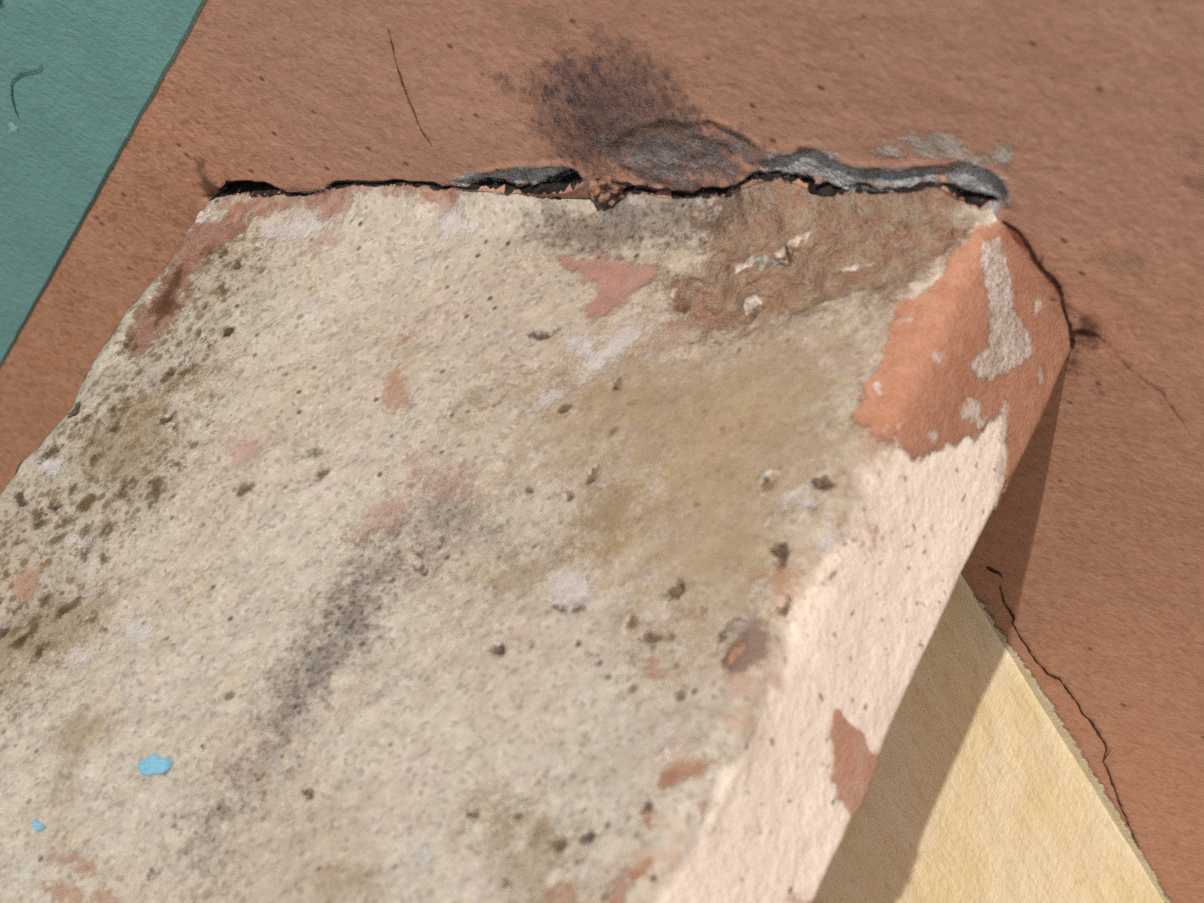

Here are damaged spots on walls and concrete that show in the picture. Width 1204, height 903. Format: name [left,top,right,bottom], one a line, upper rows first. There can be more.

spalling [451,165,583,194]
damp [499,40,695,166]
crack [209,169,1190,434]
peeling [599,111,1071,502]
peeling [830,709,881,816]
crack [986,567,1138,847]